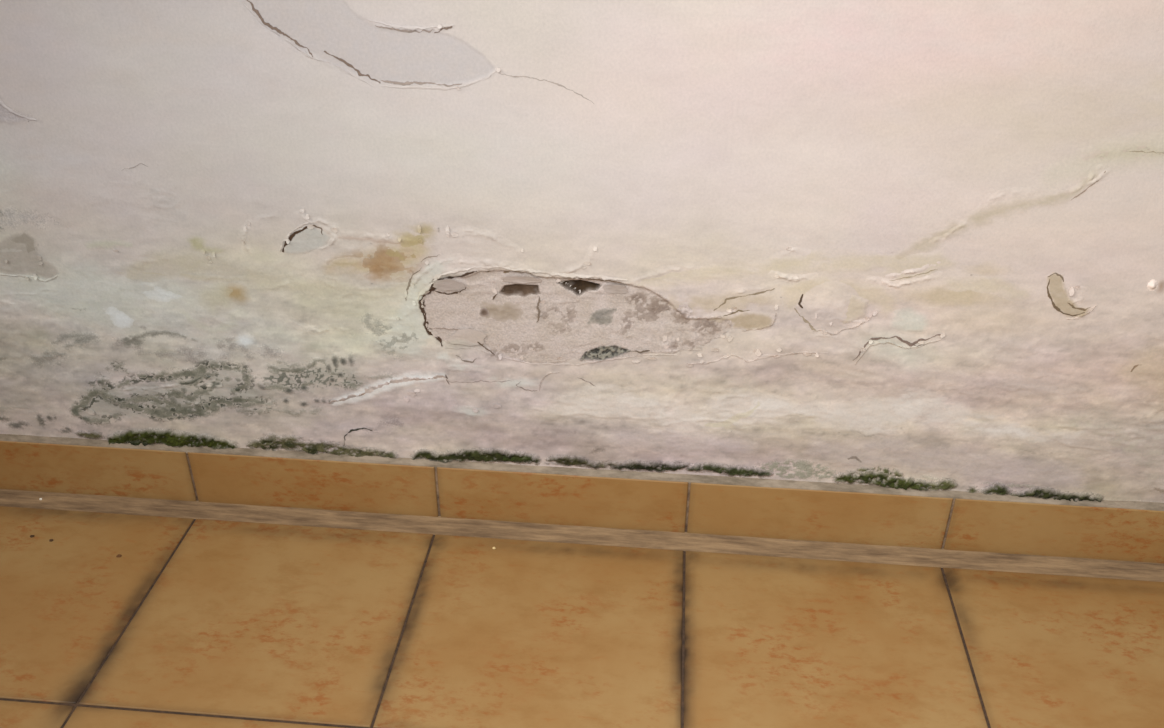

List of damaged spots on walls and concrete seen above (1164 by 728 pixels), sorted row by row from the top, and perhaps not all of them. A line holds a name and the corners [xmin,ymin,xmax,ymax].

peeling [233,0,501,90]
peeling [0,229,59,282]
water stain [0,186,411,435]
peeling [279,209,342,257]
spalling [279,253,784,407]
water stain [532,337,1164,502]